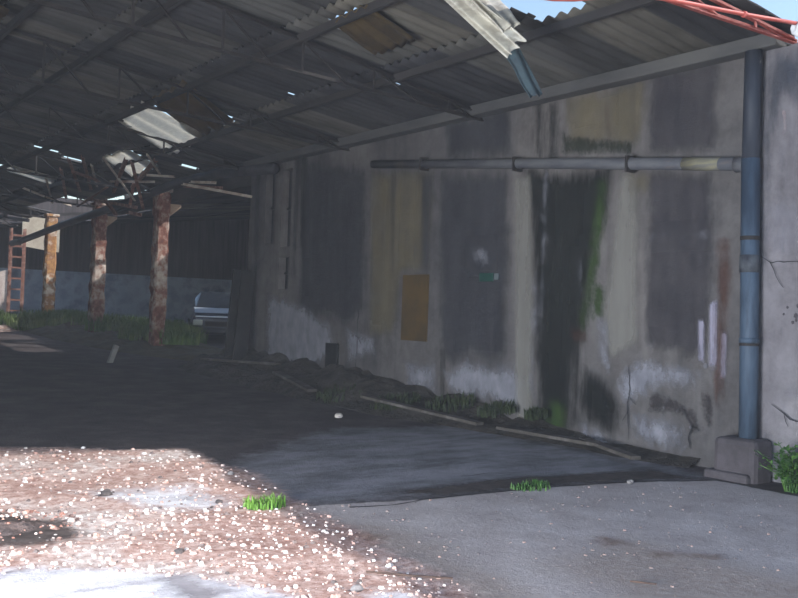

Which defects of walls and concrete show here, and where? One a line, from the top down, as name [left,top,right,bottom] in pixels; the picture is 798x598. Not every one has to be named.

leakage [516,169,635,429]
crack [761,256,798,288]